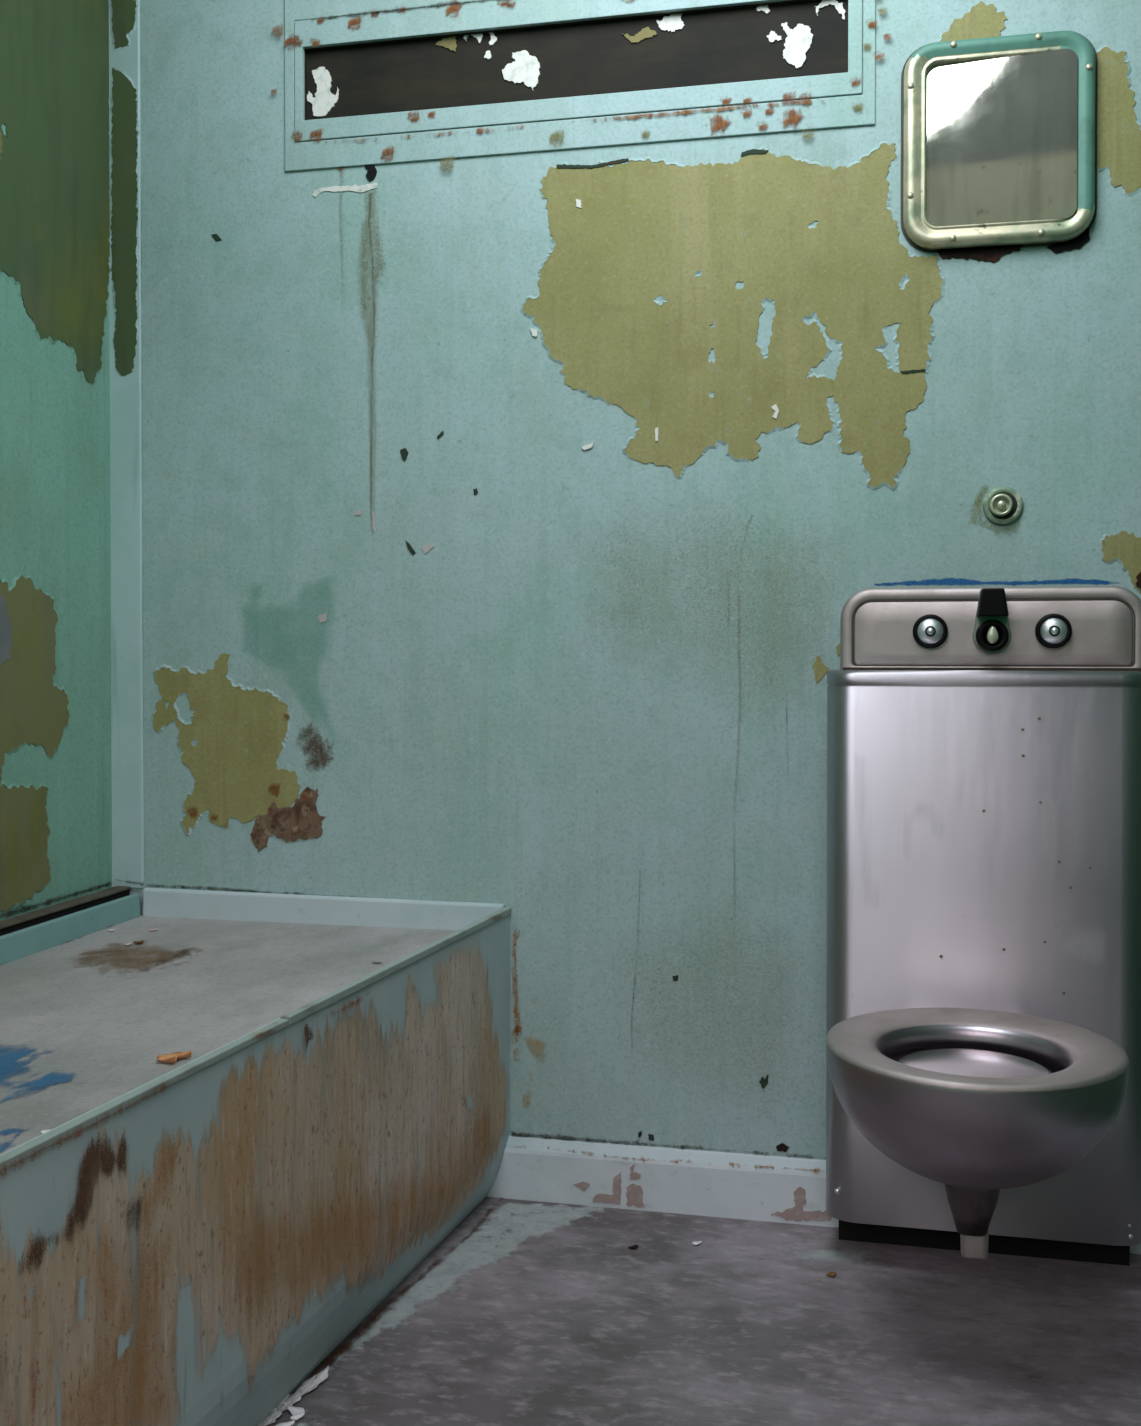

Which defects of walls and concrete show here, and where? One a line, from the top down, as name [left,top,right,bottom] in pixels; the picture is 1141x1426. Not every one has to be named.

rust [272,15,325,50]
peeling [0,0,140,387]
rust [292,110,524,162]
rust [549,90,825,147]
peeling [1096,45,1141,197]
peeling [520,141,946,492]
peeling [1099,531,1141,594]
peeling [0,573,70,912]
peeling [151,654,325,852]
leakage [70,940,203,977]
rust [730,1143,822,1174]
rust [308,1197,502,1379]